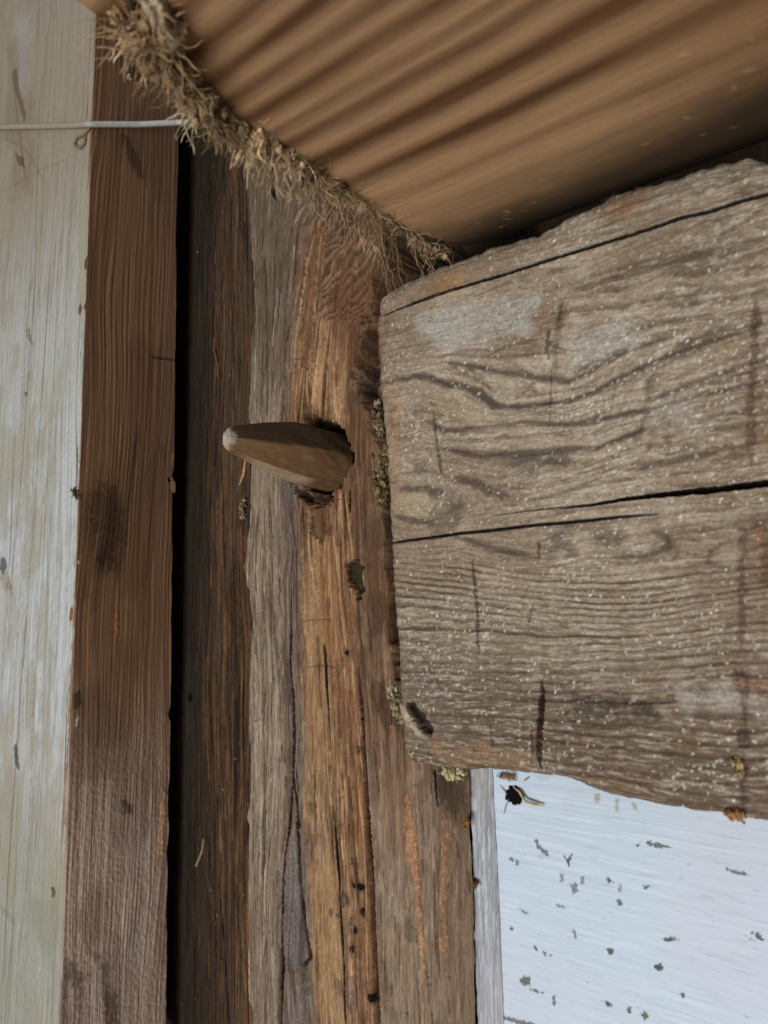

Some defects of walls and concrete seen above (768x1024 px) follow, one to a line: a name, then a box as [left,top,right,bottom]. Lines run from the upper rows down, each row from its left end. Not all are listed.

crack [385,193,768,316]
crack [394,480,768,543]
peeling [520,976,556,1006]